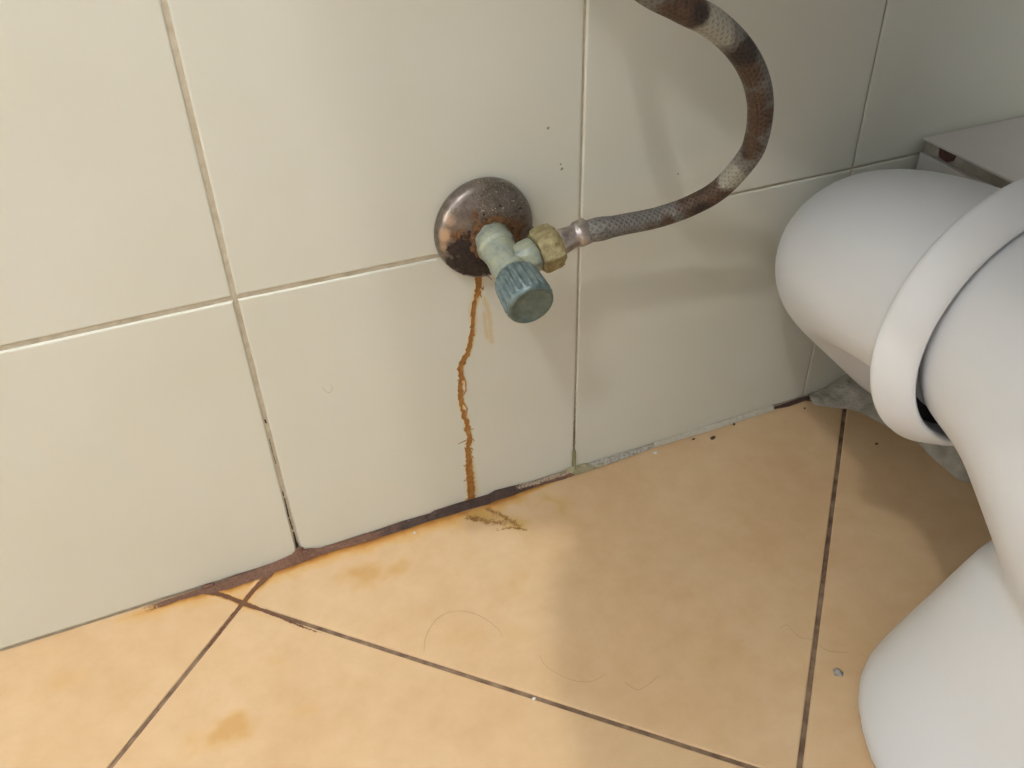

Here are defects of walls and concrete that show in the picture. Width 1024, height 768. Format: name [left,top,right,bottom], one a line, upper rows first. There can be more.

corrosion [469,214,514,258]
corrosion [104,245,584,650]